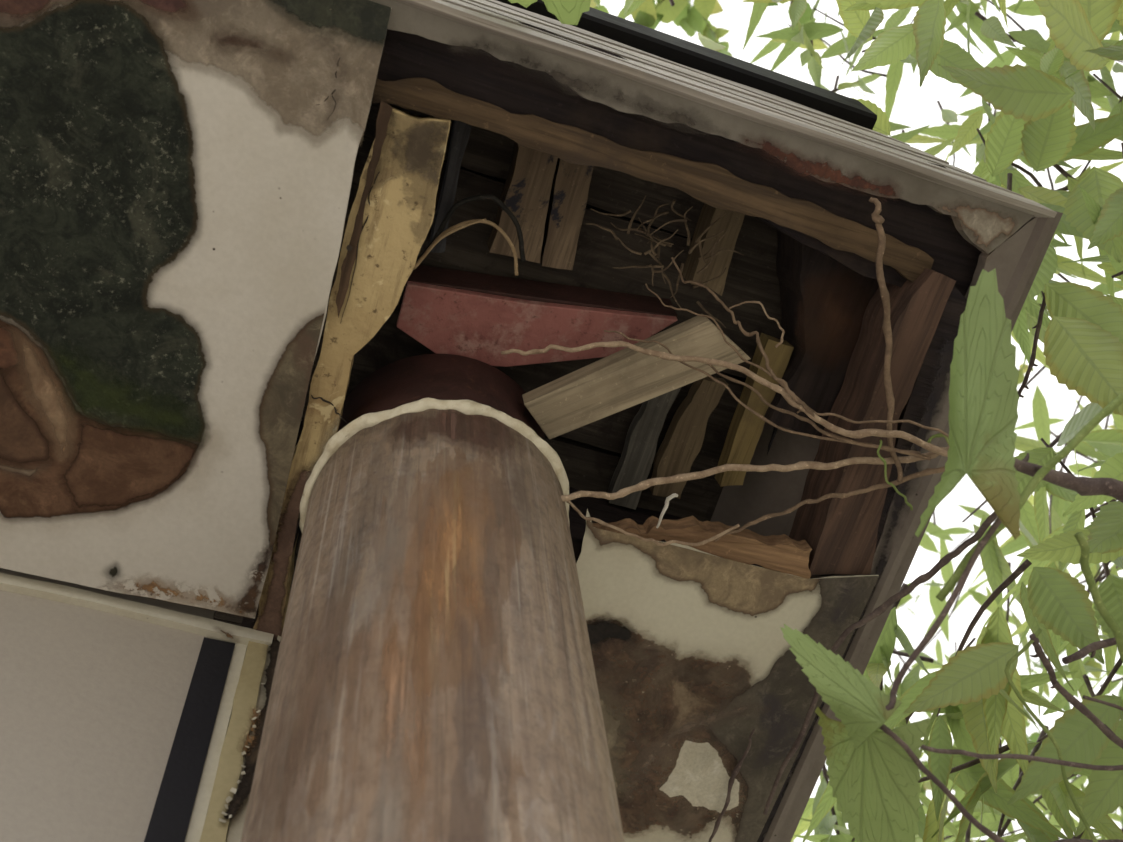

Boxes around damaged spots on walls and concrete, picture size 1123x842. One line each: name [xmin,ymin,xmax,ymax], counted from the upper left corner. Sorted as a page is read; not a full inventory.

leakage [0,0,391,519]
corrosion [745,139,897,197]